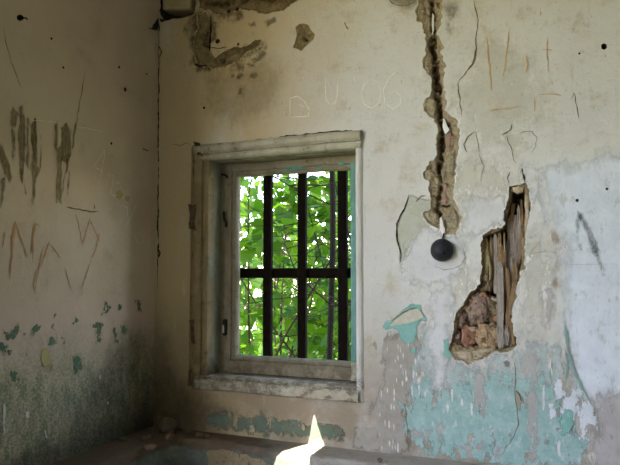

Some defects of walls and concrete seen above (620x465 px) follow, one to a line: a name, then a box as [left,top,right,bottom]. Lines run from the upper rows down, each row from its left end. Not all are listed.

flaking render [184,0,298,70]
flaking render [293,23,315,51]
crack [155,25,163,289]
crack [415,0,466,270]
crack [503,125,537,164]
peeling [0,324,42,356]
peeling [353,168,620,465]
peeling [205,410,345,441]